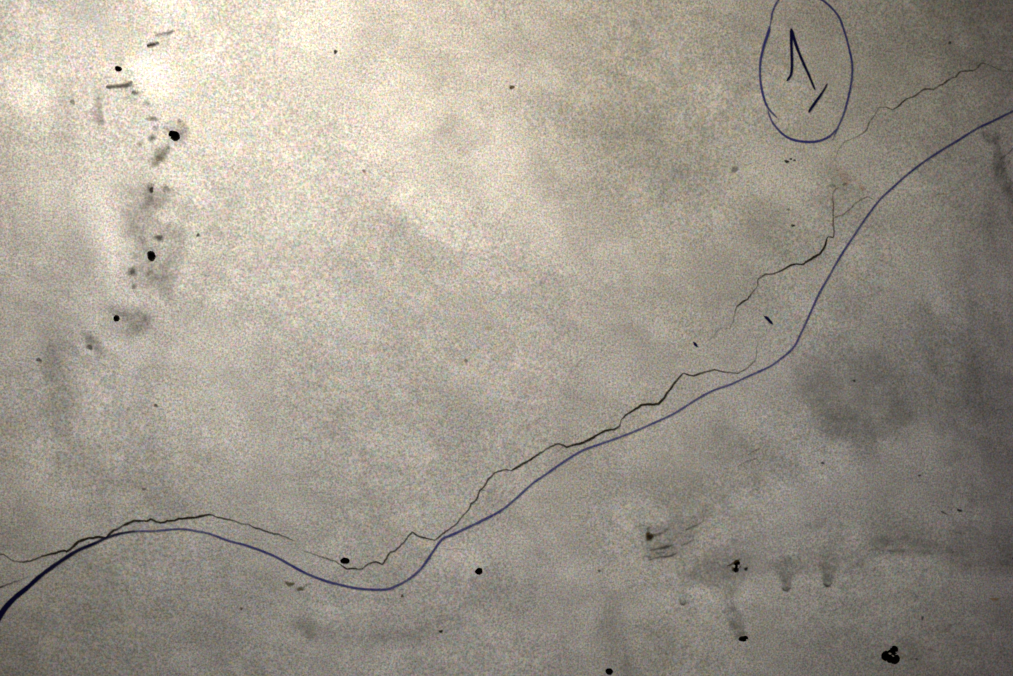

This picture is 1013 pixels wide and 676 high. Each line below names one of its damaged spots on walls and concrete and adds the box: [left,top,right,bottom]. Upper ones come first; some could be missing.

crack [866,63,981,130]
crack [735,203,847,311]
crack [327,365,750,570]
crack [0,514,286,588]